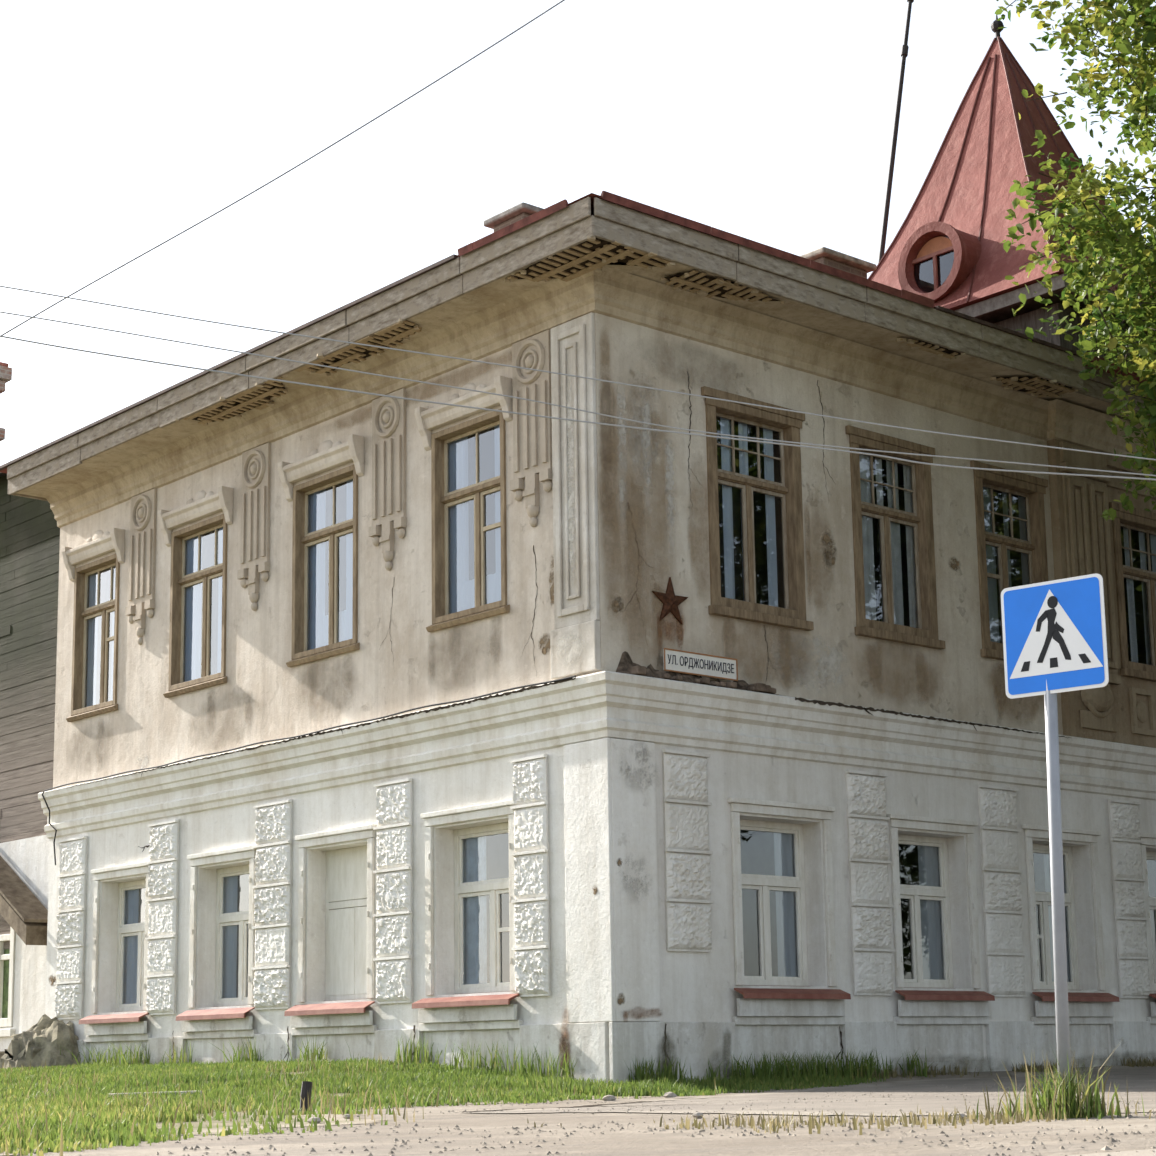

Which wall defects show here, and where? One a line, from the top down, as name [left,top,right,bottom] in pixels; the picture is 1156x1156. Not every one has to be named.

crack [68,545,576,788]
peeling [627,665,646,675]
peeling [662,674,776,694]